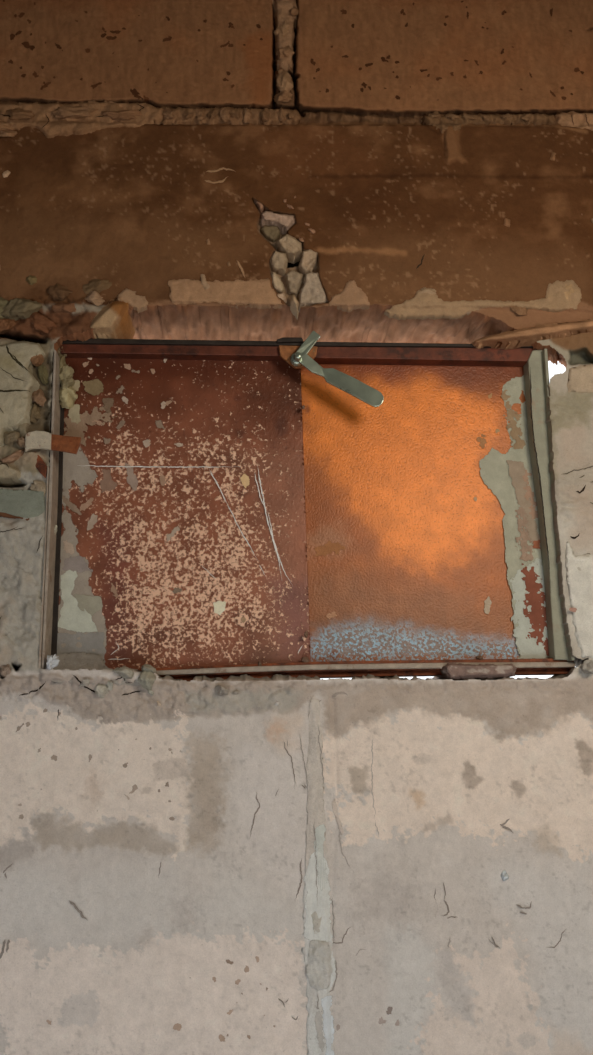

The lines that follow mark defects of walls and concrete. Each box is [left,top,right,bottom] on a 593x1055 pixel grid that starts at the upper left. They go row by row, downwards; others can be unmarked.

spalling [254,196,328,320]
peeling [477,375,549,659]
corrosion [501,390,549,656]
crack [564,466,593,504]
water stain [0,725,237,880]